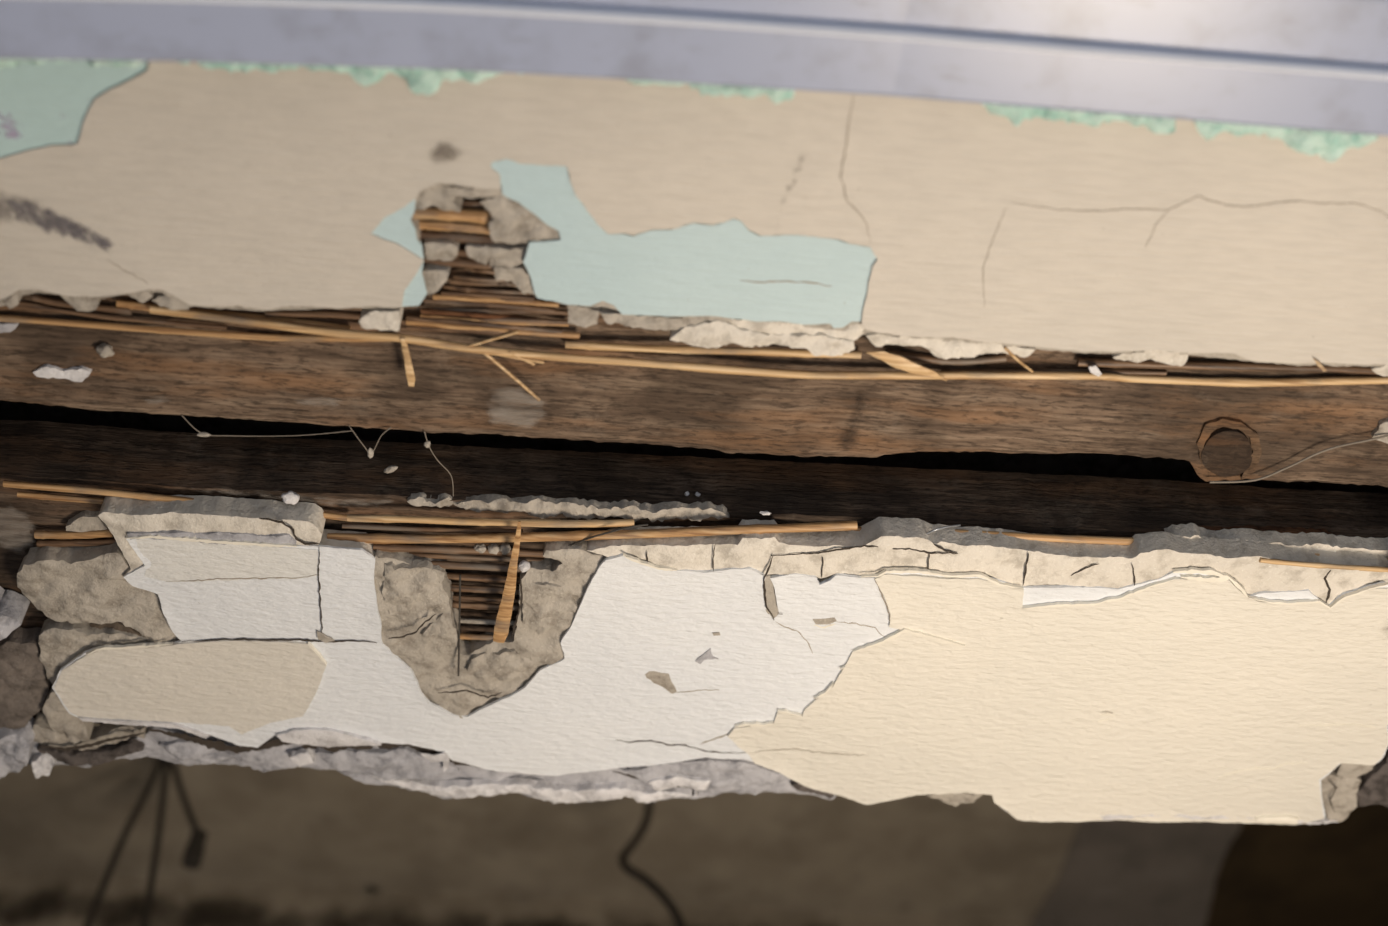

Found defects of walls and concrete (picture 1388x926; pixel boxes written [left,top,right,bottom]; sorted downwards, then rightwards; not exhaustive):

flaking render [372,159,877,328]
crack [982,195,1388,306]
crack [1022,553,1030,585]
crack [1323,570,1331,603]
flaking render [0,495,1388,804]
spalling [927,793,983,807]
flaking render [1030,725,1388,926]